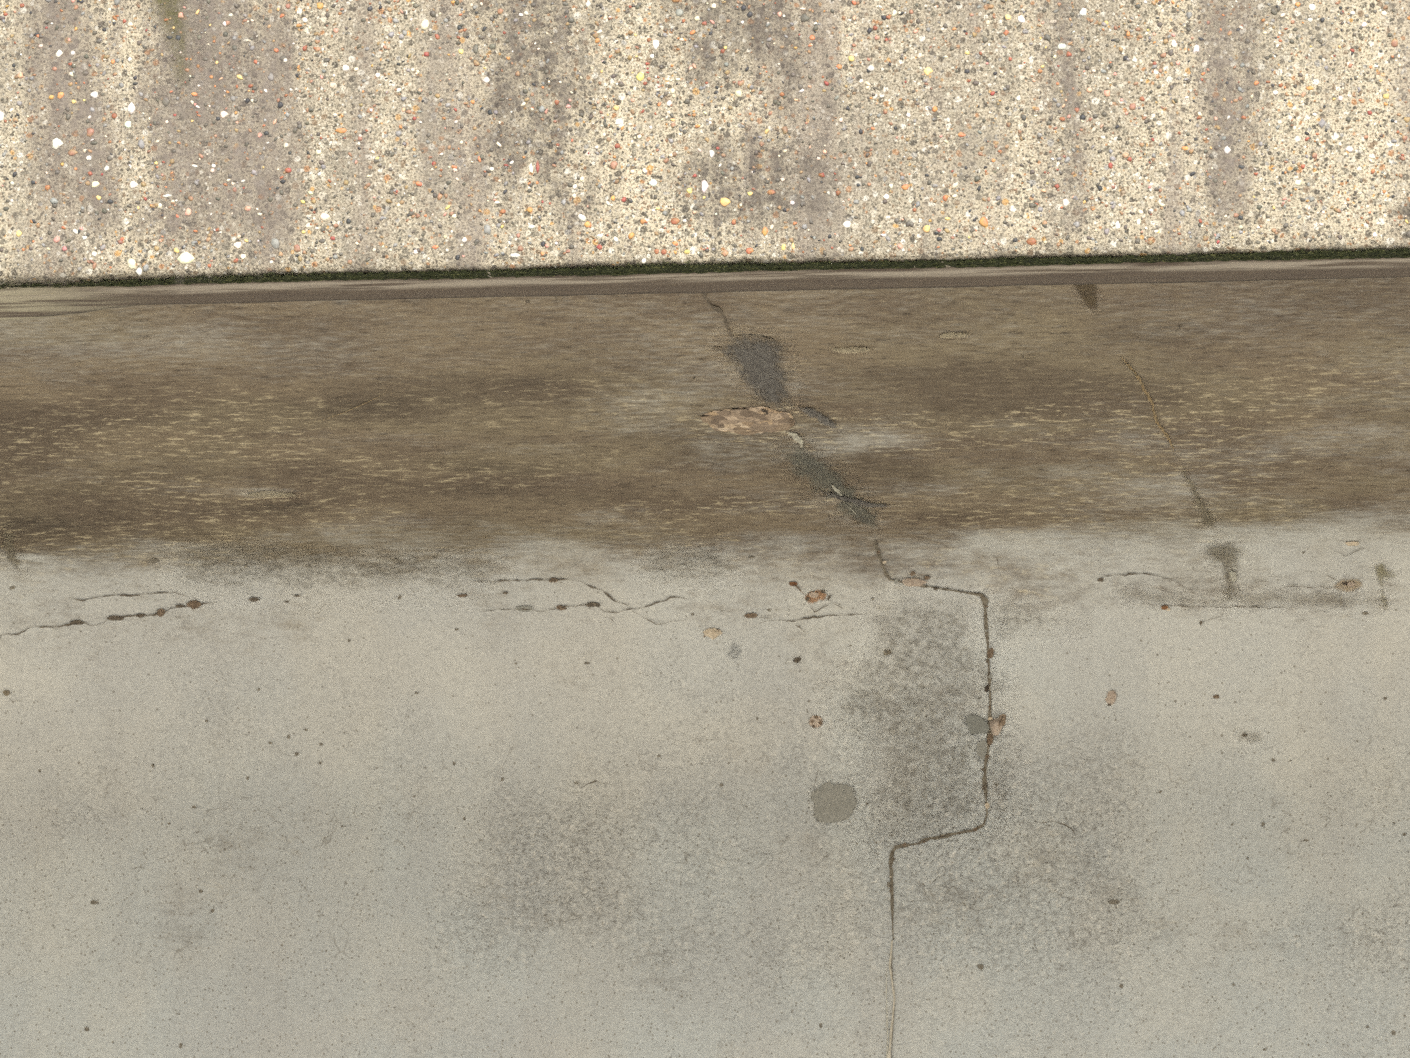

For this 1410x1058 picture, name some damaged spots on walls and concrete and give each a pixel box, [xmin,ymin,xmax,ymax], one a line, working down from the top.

water stain [495,0,575,171]
water stain [700,151,800,225]
crack [702,293,734,350]
water stain [1075,284,1096,309]
water stain [788,432,888,524]
water stain [1211,546,1236,581]
crack [1,592,300,636]
crack [457,561,687,625]
crack [744,613,863,629]